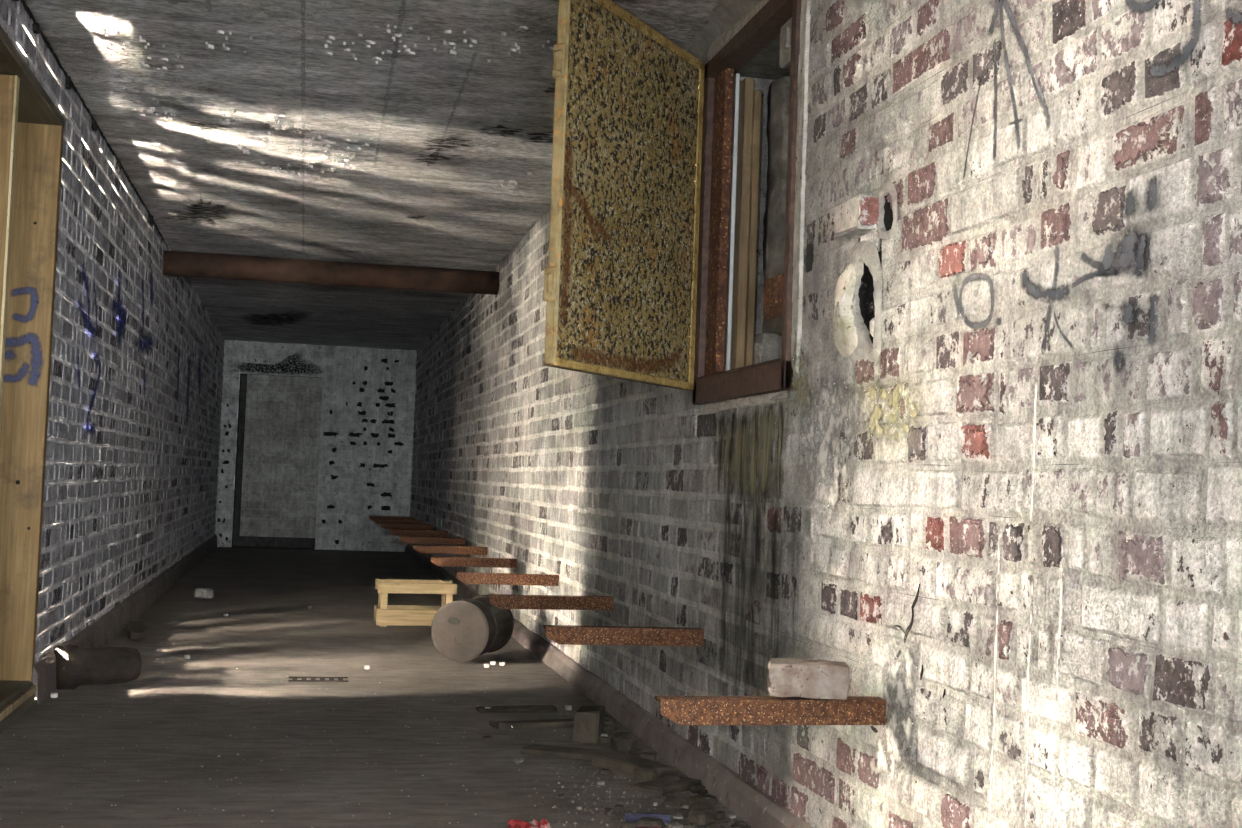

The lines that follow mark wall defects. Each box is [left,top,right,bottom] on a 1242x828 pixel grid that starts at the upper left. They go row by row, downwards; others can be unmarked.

corrosion [560,144,611,322]
corrosion [574,348,679,371]
spalling [849,181,901,381]